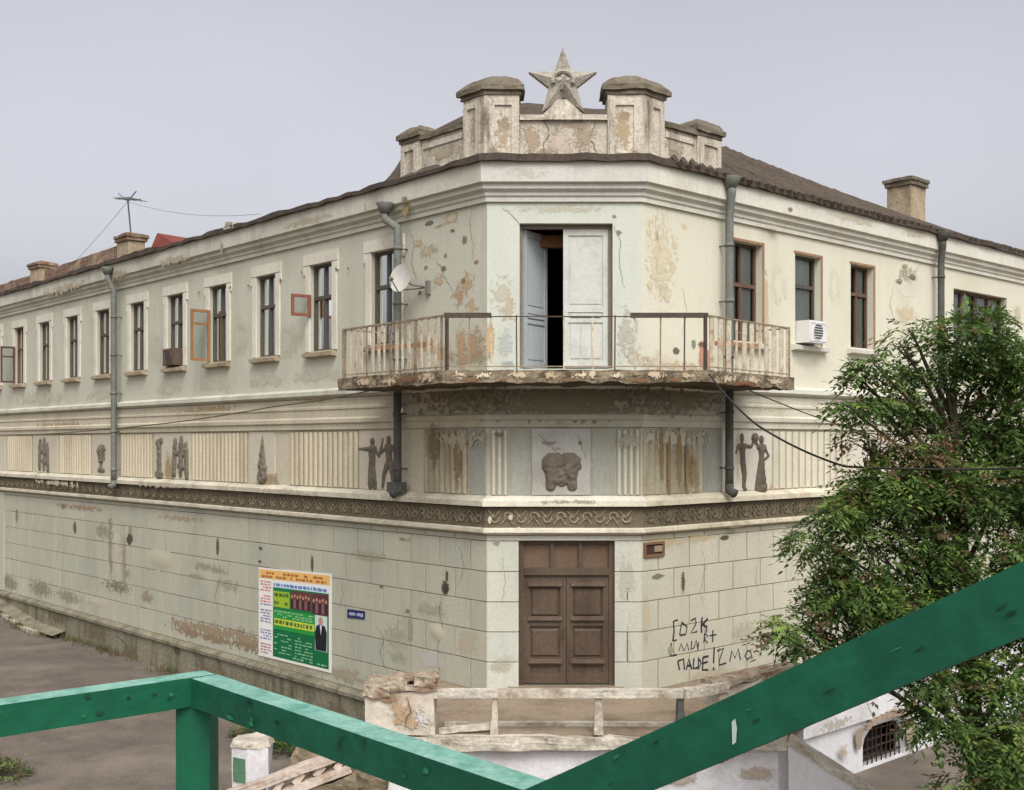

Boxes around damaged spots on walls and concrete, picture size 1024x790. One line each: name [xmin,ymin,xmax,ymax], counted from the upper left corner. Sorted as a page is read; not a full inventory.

peeling [541,123,578,154]
peeling [616,107,633,153]
peeling [425,212,467,244]
peeling [415,238,447,288]
peeling [645,207,688,312]
rust [392,321,495,384]